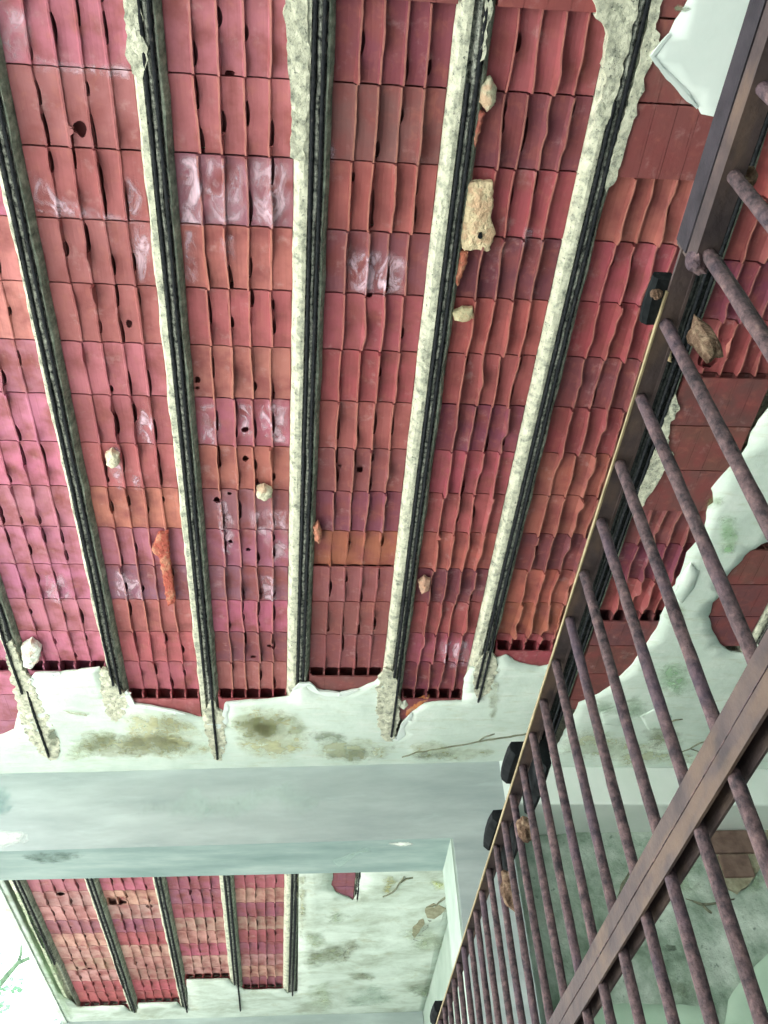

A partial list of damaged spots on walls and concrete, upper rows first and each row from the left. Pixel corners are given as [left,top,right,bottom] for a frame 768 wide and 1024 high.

water stain [182,158,239,245]
water stain [255,165,286,223]
water stain [351,254,401,290]
spalling [0,91,185,723]
spalling [123,0,240,761]
spalling [283,0,358,697]
spalling [375,0,493,742]
spalling [473,0,698,749]
water stain [79,716,189,756]
water stain [237,714,302,754]
spalling [288,874,298,996]
water stain [307,935,354,965]